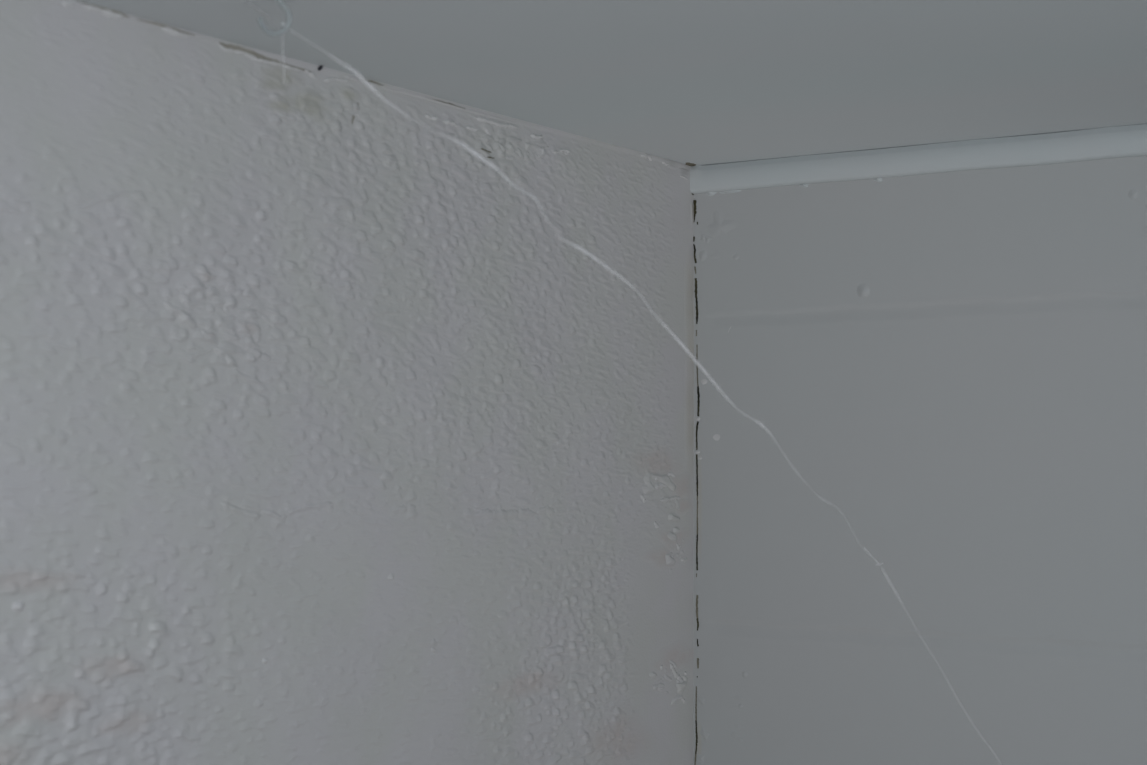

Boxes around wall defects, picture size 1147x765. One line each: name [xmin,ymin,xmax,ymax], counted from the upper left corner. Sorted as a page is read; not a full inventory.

crack [691,193,700,765]